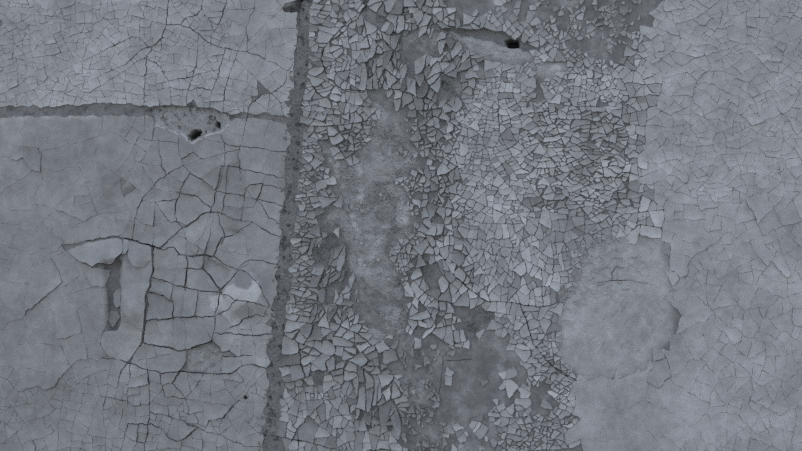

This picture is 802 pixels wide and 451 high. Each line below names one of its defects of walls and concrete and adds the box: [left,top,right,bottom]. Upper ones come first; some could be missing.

peeling [0,0,305,451]
crack [86,128,283,451]
crack [114,1,292,121]
peeling [276,0,802,451]